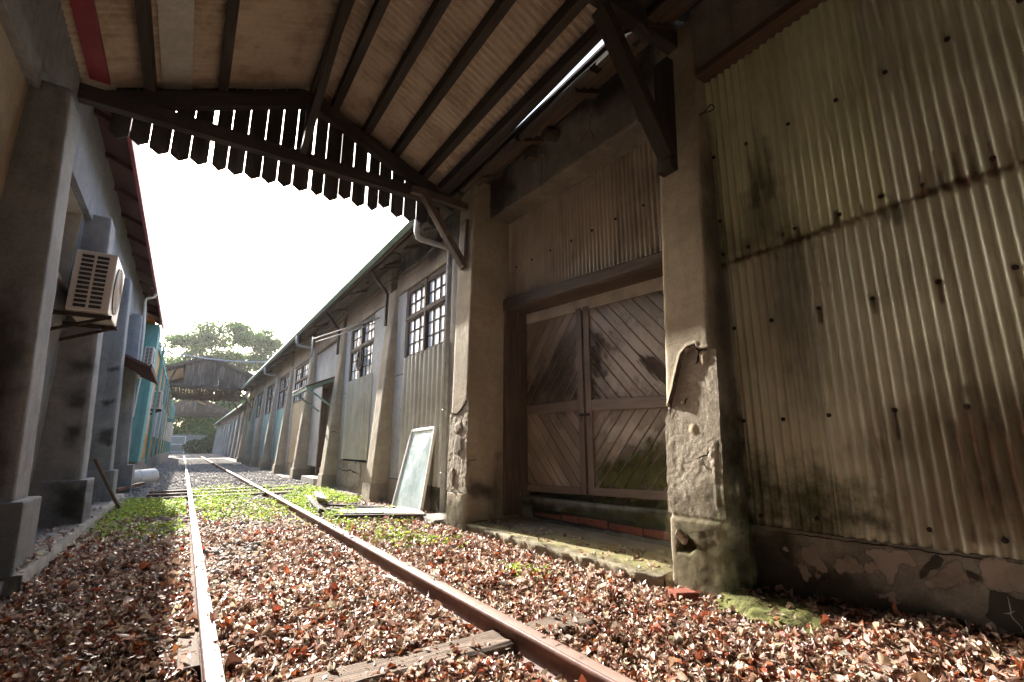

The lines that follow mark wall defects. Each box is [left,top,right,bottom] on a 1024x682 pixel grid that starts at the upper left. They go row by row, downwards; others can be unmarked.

rust [912,143,1024,199]
rust [723,209,866,266]
damp [527,319,666,405]
spalling [665,345,726,520]
peeling [783,543,944,606]
peeling [966,556,1024,633]